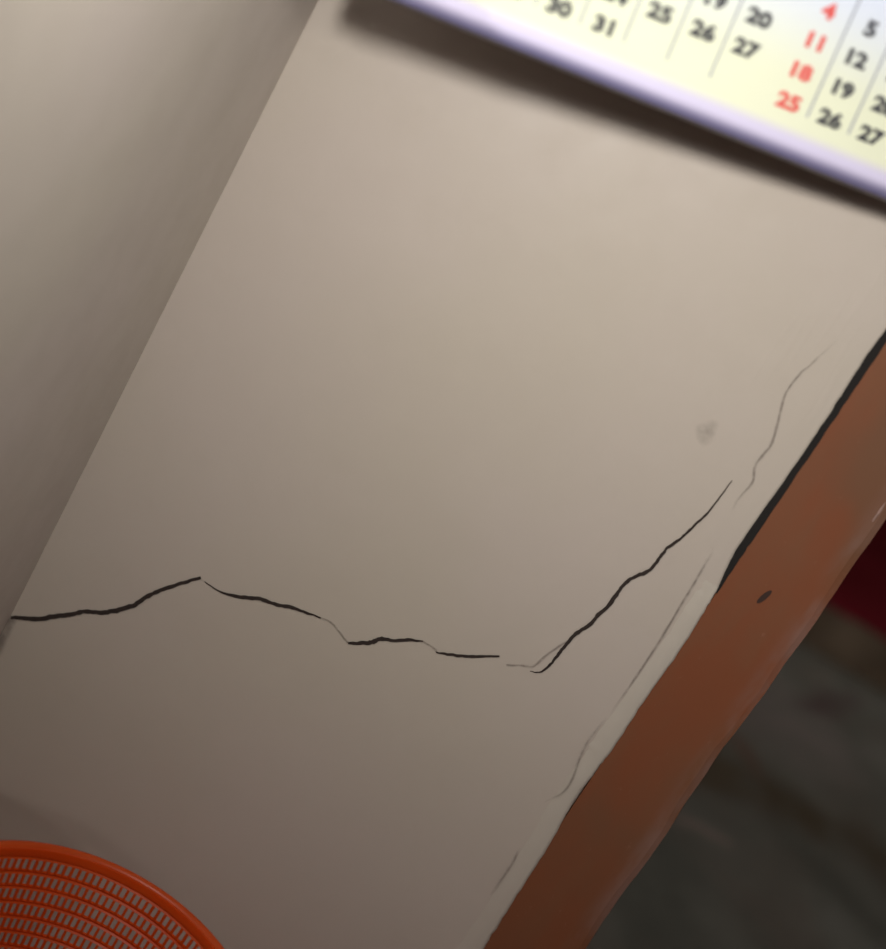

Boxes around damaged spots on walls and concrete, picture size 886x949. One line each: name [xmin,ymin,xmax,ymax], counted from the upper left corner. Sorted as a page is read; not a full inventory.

crack [11,576,321,621]
crack [530,481,732,673]
crack [348,636,500,658]